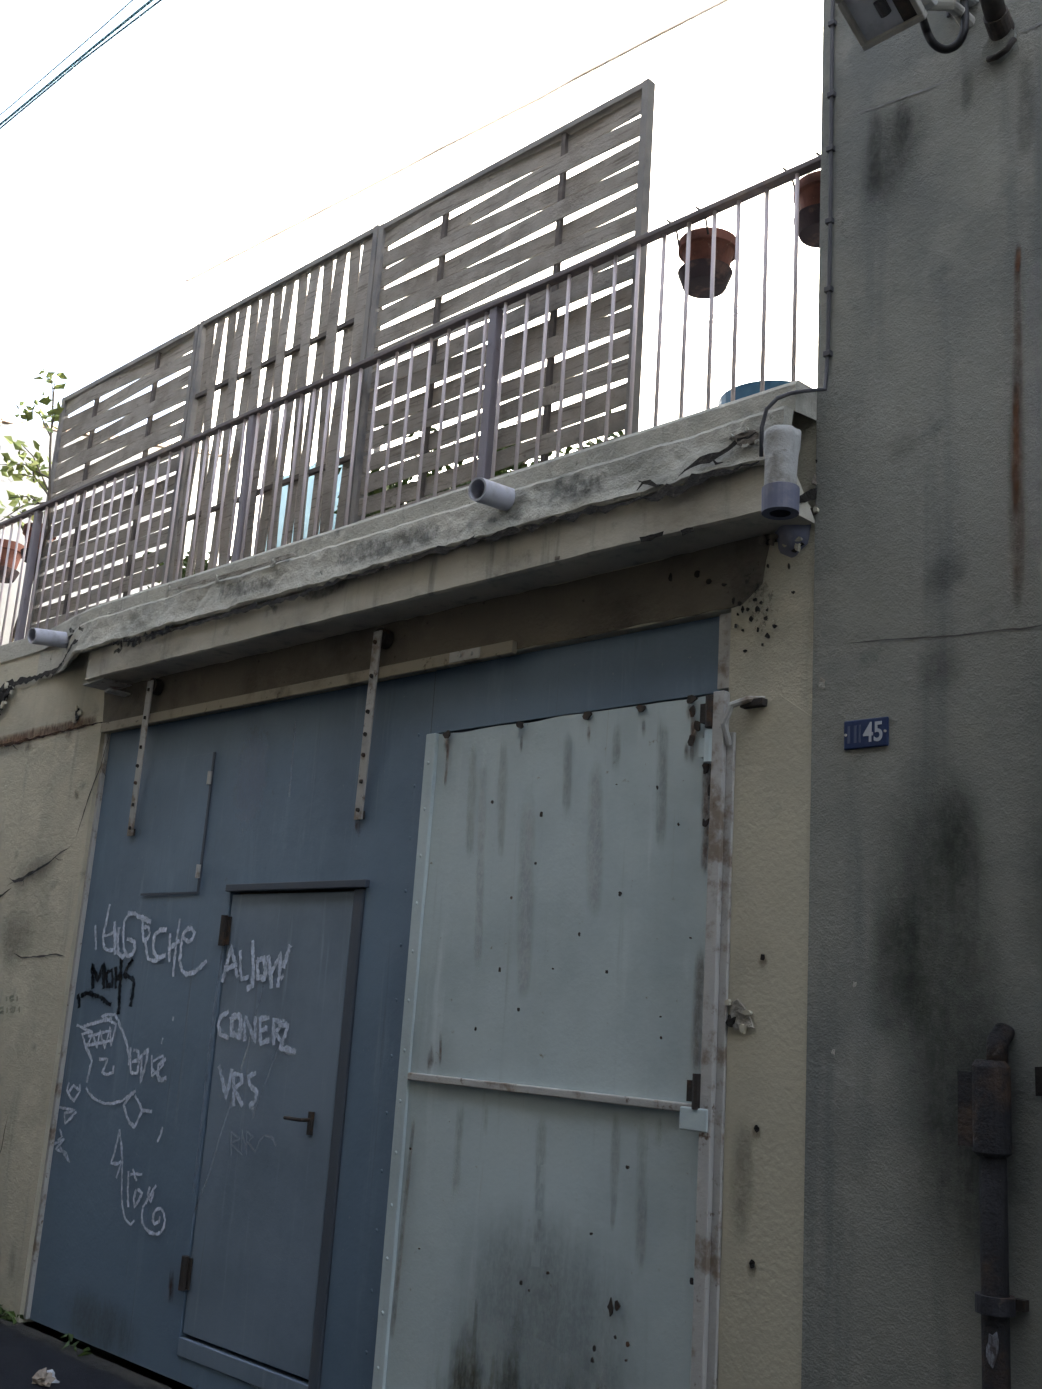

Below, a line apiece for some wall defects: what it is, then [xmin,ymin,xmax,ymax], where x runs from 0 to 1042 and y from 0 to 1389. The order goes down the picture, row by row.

rust [1013,248,1021,579]
crack [122,432,759,642]
rust [685,695,701,754]
rust [702,763,711,868]